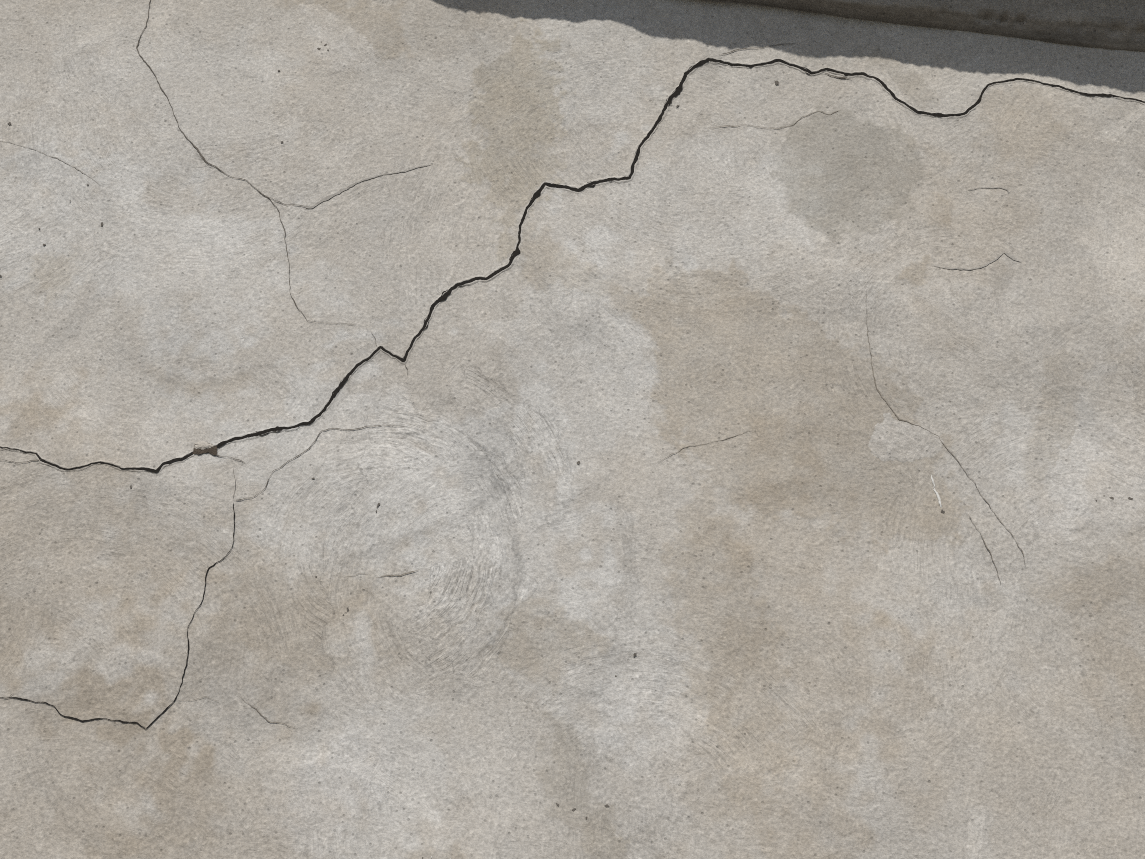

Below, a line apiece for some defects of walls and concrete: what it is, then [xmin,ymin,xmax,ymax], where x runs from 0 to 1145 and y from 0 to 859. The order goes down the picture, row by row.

crack [0,43,1145,730]
leakage [448,16,977,859]
leakage [764,41,1080,246]